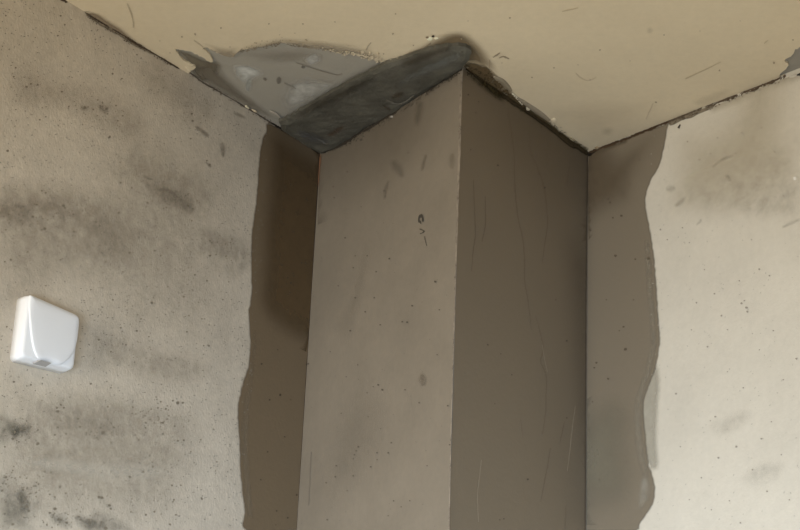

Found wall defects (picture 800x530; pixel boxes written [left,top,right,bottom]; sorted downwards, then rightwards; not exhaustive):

spalling [169,33,384,126]